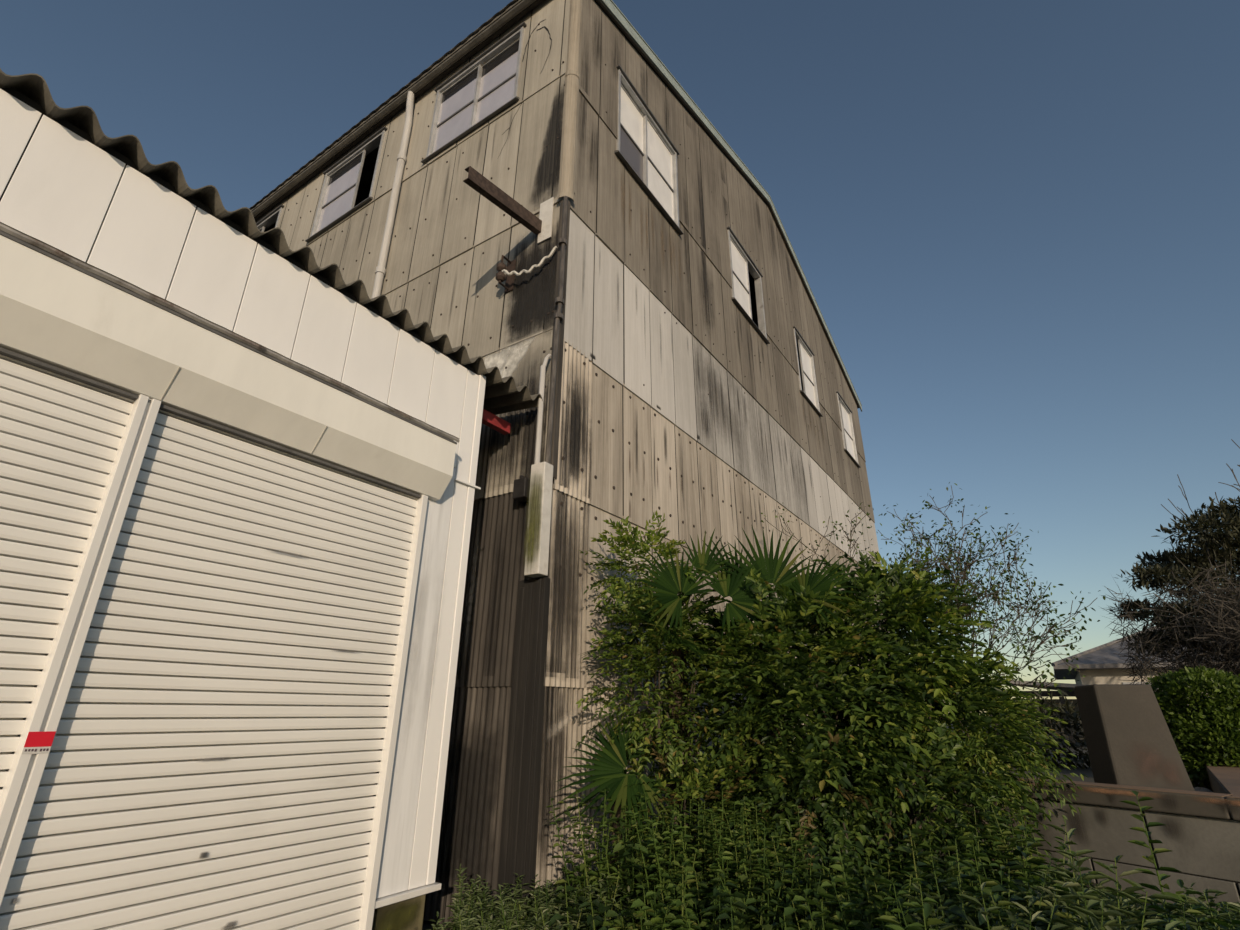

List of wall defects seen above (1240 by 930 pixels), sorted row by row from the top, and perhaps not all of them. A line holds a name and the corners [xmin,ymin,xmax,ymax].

damp [532,91,564,200]
damp [580,70,596,165]
damp [477,227,559,561]
damp [539,381,591,842]